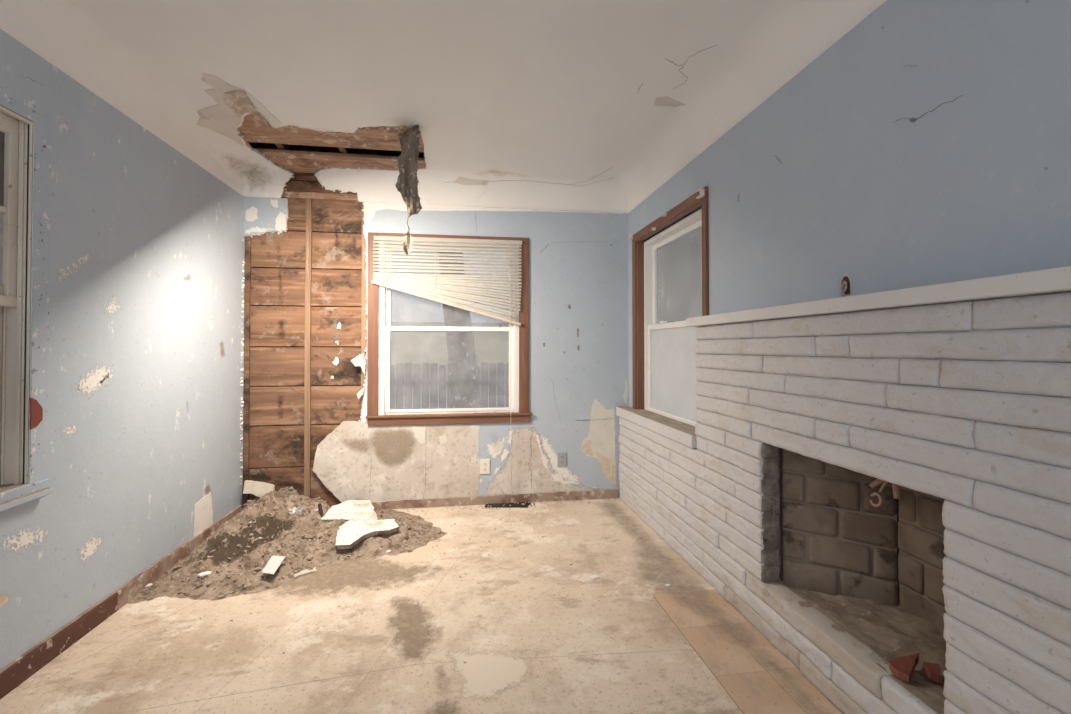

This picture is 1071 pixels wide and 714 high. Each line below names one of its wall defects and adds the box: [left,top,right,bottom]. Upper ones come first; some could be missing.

crack [892,95,963,123]
peeling [197,73,415,241]
spalling [77,366,113,396]
leakage [350,431,413,464]
flaking render [312,366,616,503]
spalling [3,526,48,554]
spalling [80,533,103,563]